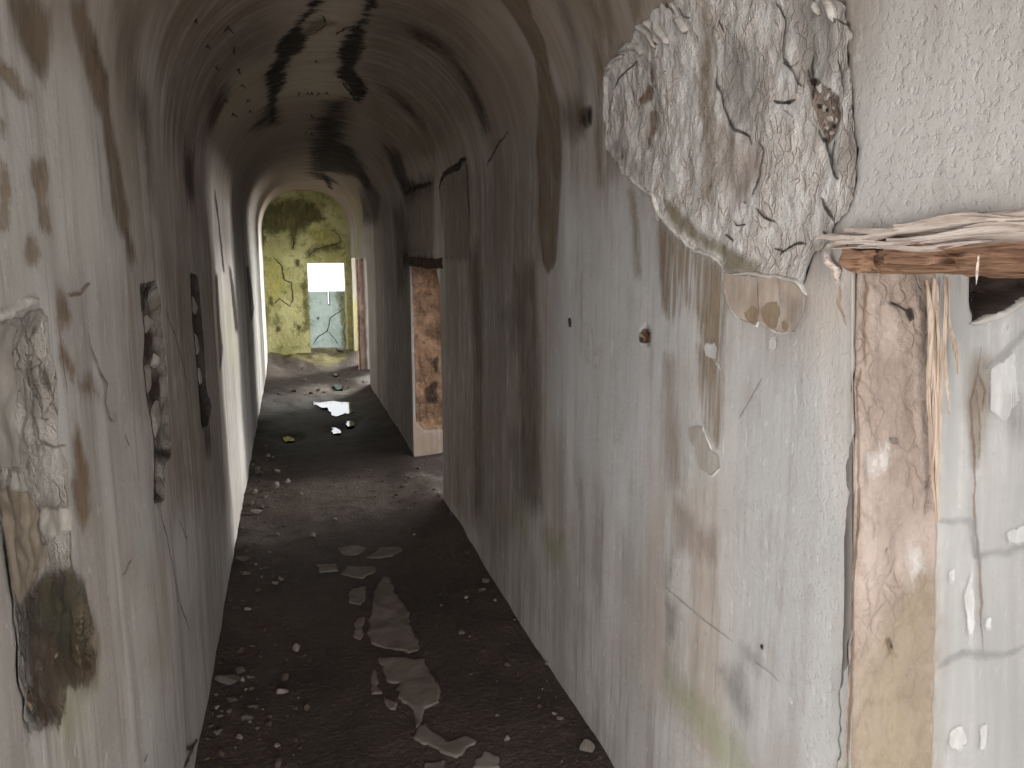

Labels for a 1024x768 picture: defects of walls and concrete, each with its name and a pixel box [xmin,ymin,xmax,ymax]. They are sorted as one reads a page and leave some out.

spalling [140,280,172,503]
spalling [190,273,212,452]
crack [272,229,342,306]
crack [313,309,346,344]
flaking render [412,266,442,429]
water stain [503,0,561,497]
spalling [579,0,856,350]
spalling [969,276,1024,324]
peeling [990,353,1020,421]
spalling [0,295,99,733]
flaking render [837,273,936,768]
peeling [965,574,992,638]